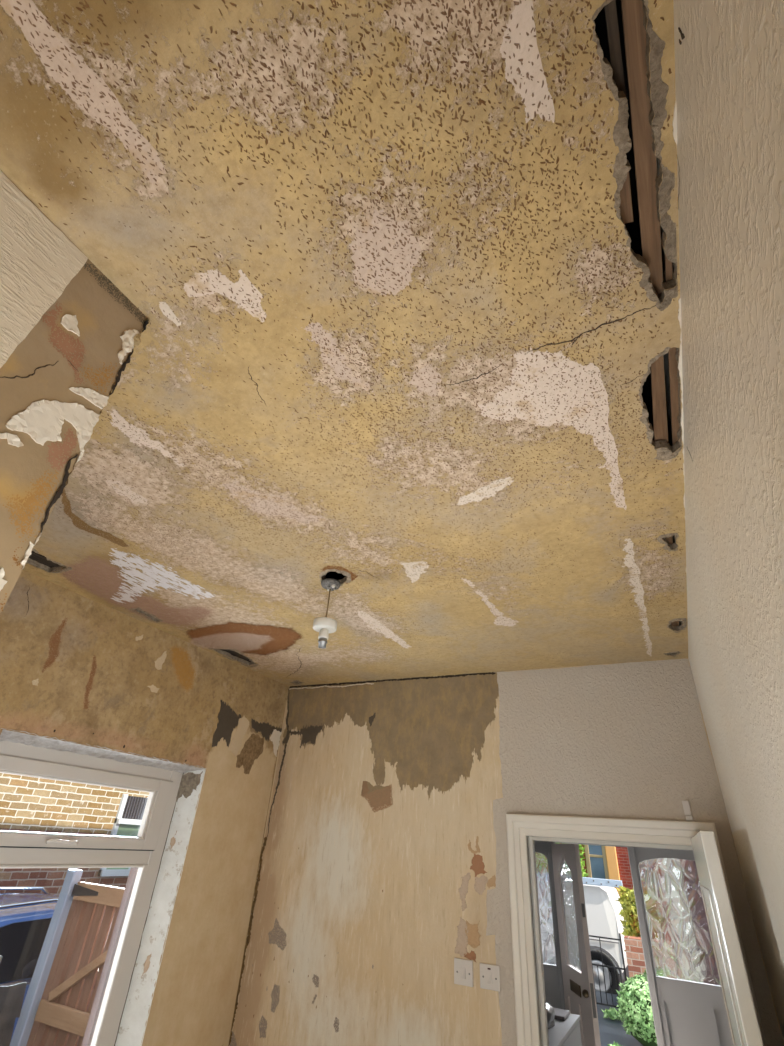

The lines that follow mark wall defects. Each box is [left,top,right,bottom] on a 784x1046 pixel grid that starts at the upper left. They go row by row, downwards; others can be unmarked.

spalling [592,0,678,311]
peeling [41,301,87,384]
spalling [118,318,150,364]
crack [529,303,661,352]
spalling [638,347,682,461]
peeling [46,428,78,472]
spalling [26,548,72,573]
peeling [109,548,215,623]
spalling [208,648,259,667]
peeling [212,672,499,813]
crack [229,647,495,1045]
spalling [454,836,497,962]